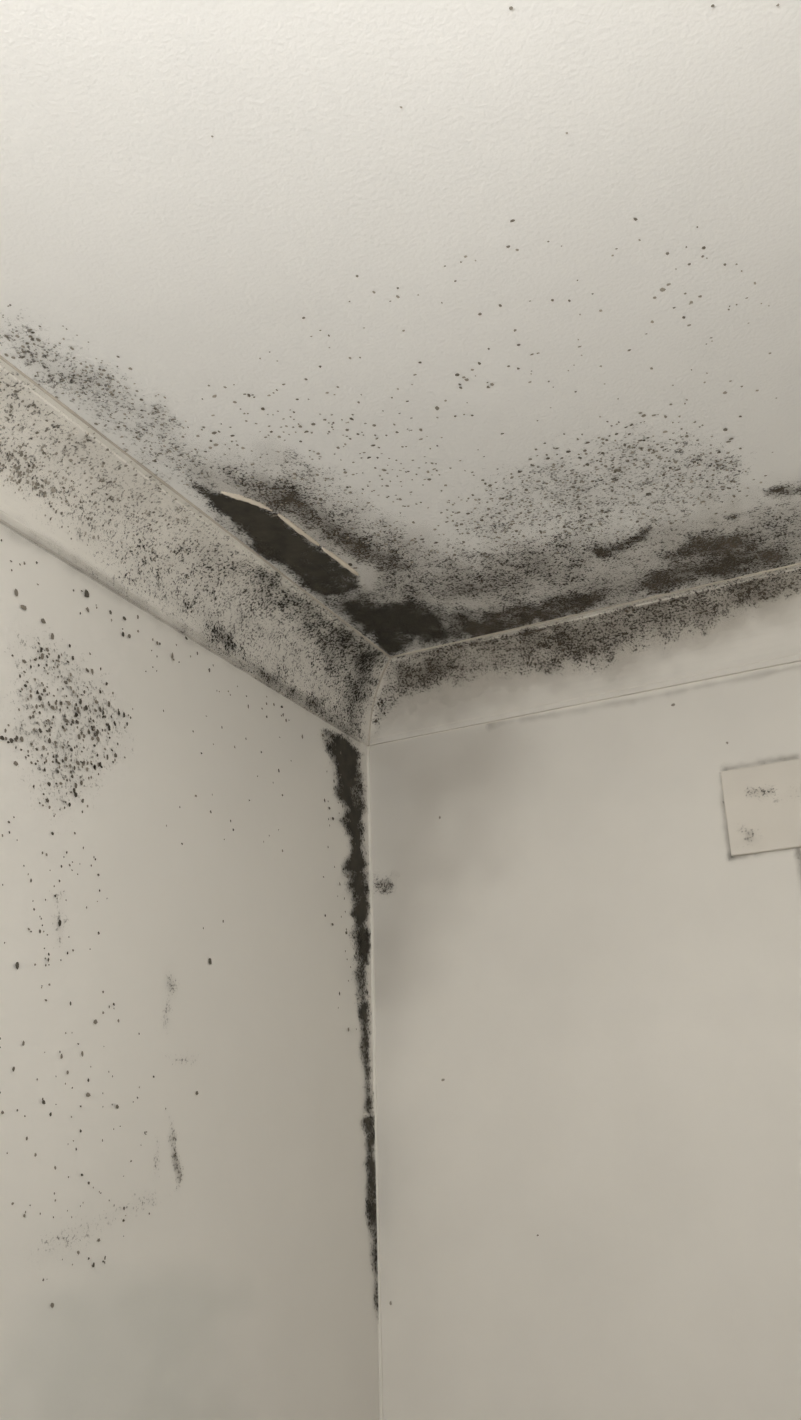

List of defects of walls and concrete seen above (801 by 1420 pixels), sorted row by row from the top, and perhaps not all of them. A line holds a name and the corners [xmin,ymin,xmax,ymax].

water stain [653,246,708,326]
peeling [192,483,359,596]
water stain [0,304,801,1312]